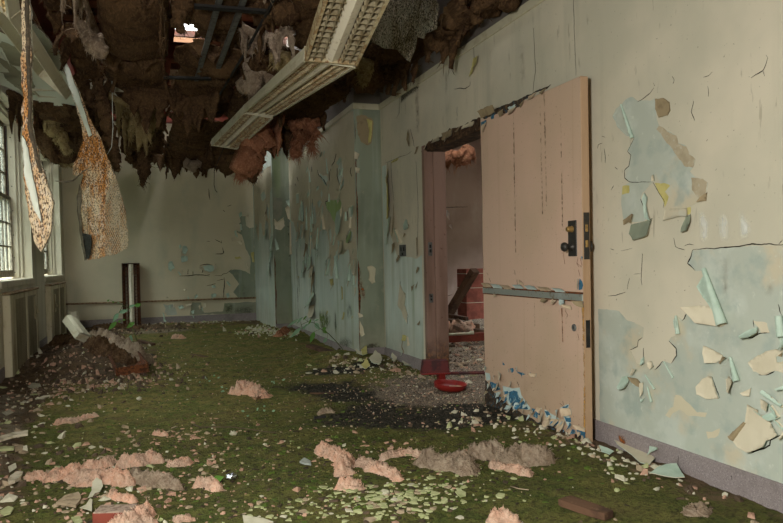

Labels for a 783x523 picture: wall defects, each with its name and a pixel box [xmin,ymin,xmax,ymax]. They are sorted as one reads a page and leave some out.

peeling [155,85,550,382]
crack [674,241,783,250]
peeling [420,245,783,492]
peeling [242,471,517,523]
peeling [676,478,714,509]